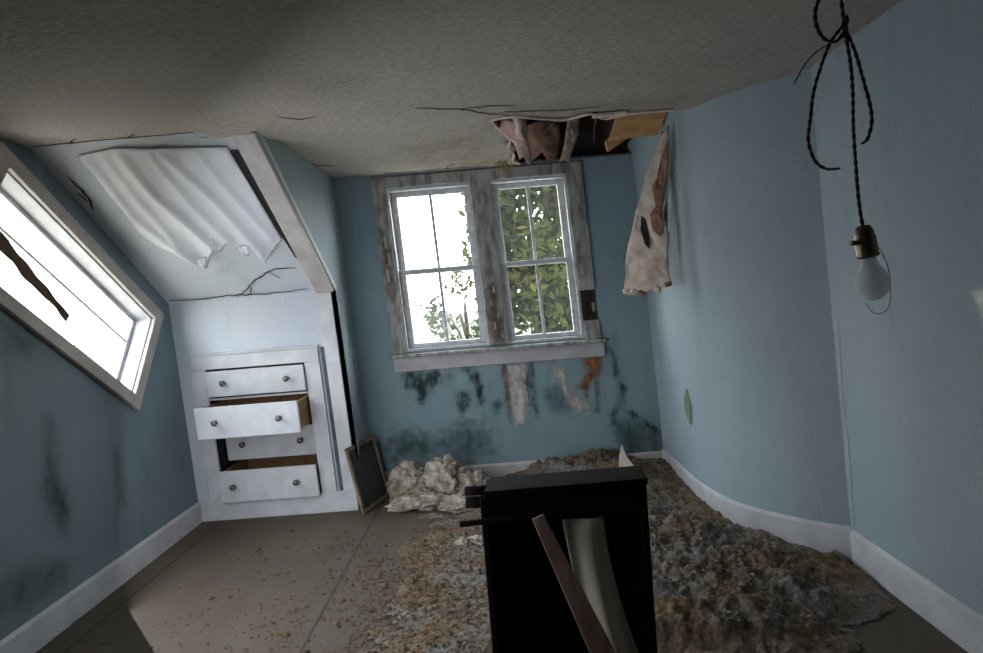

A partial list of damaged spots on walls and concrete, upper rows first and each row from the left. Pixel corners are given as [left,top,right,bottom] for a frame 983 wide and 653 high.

leakage [407,372,440,401]
leakage [457,370,483,411]
leakage [495,362,536,425]
leakage [614,411,658,453]